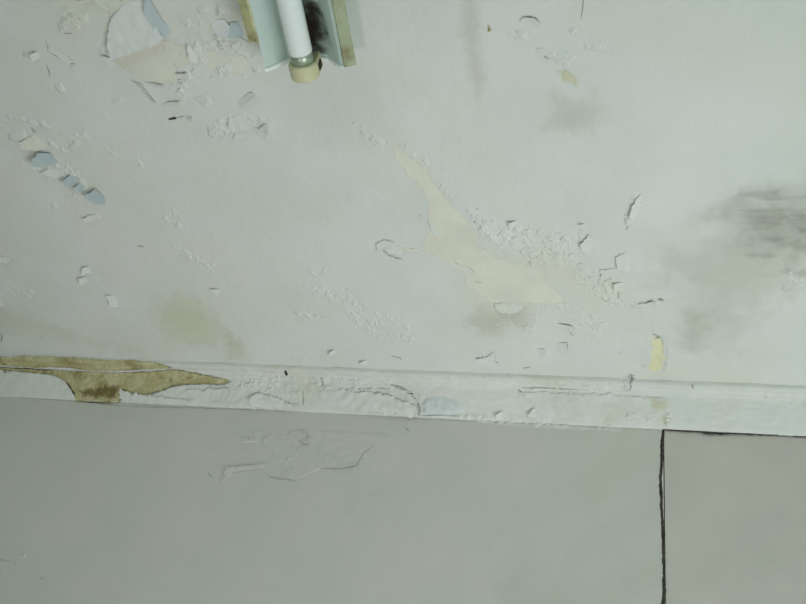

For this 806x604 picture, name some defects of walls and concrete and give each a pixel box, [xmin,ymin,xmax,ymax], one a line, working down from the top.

peeling [94,0,268,140]
peeling [7,126,106,223]
peeling [0,356,467,419]
crack [424,370,806,604]